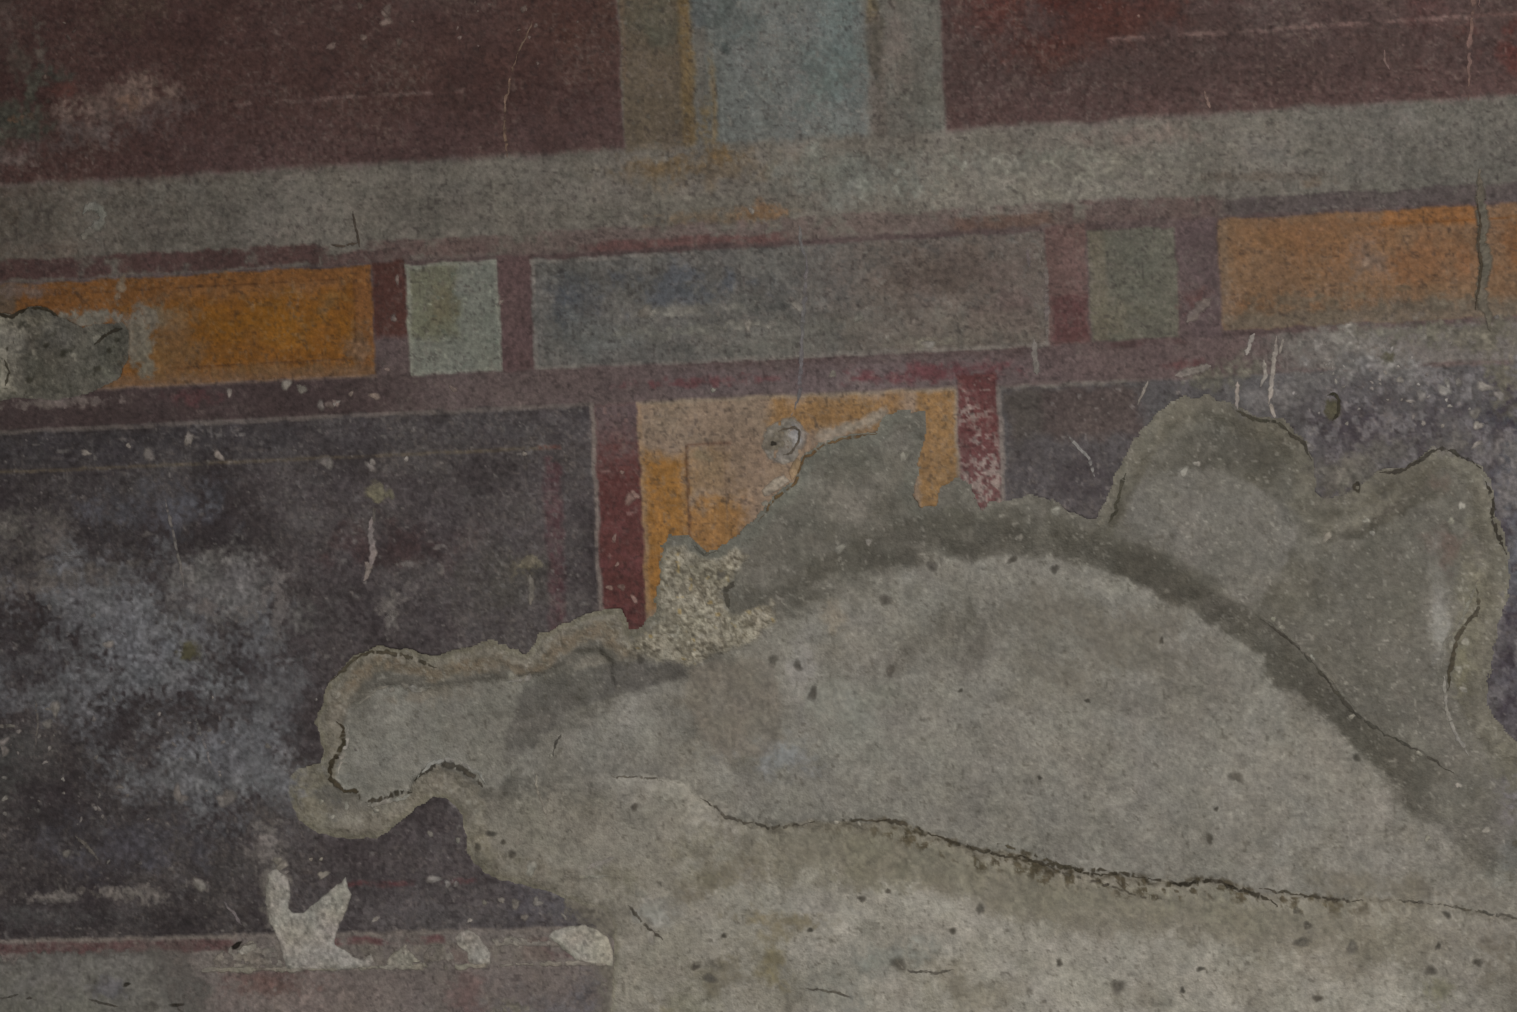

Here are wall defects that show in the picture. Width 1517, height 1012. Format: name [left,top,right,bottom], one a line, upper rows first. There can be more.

crack [1475,169,1493,331]
flaking render [0,306,130,401]
peeling [0,702,60,764]
flaking render [282,340,1517,1012]